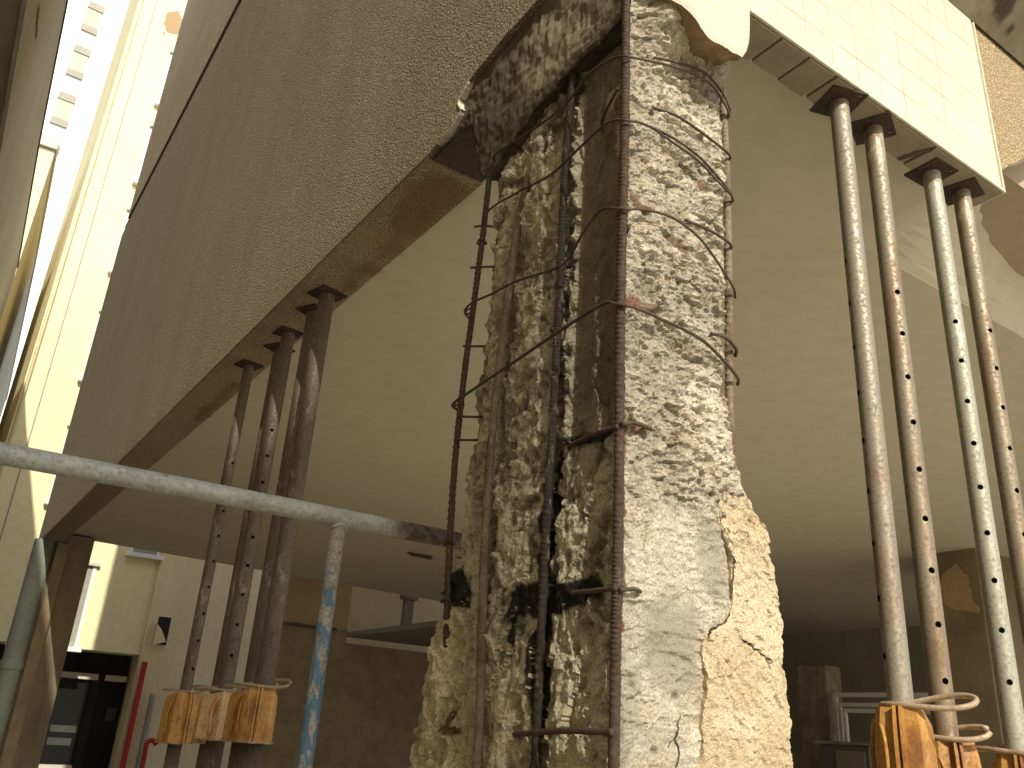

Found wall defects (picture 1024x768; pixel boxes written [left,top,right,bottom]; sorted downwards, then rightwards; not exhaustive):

peeling [436,81,474,147]
spalling [663,114,709,146]
spalling [678,164,711,192]
spalling [627,194,655,216]
spalling [664,235,689,266]
spalling [560,431,613,446]
spalling [630,425,648,435]
damp [441,565,471,608]
crack [708,517,773,669]
peeling [940,564,980,613]
rust [438,709,462,735]